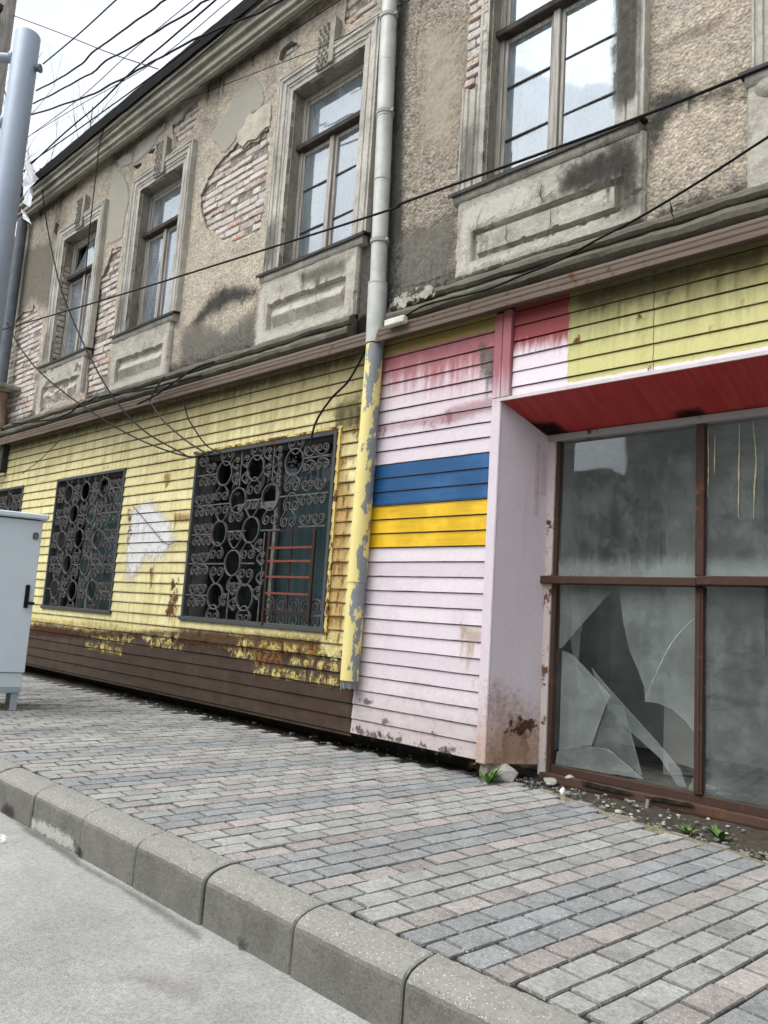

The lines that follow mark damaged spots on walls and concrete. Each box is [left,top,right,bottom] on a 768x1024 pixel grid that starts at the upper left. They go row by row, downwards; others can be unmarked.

flaking render [202,103,272,243]
water stain [559,81,735,206]
flaking render [7,247,168,422]
peeling [126,499,176,584]
peeling [31,618,134,656]
peeling [227,630,340,686]
peeling [350,718,462,757]
corrosion [489,695,540,767]